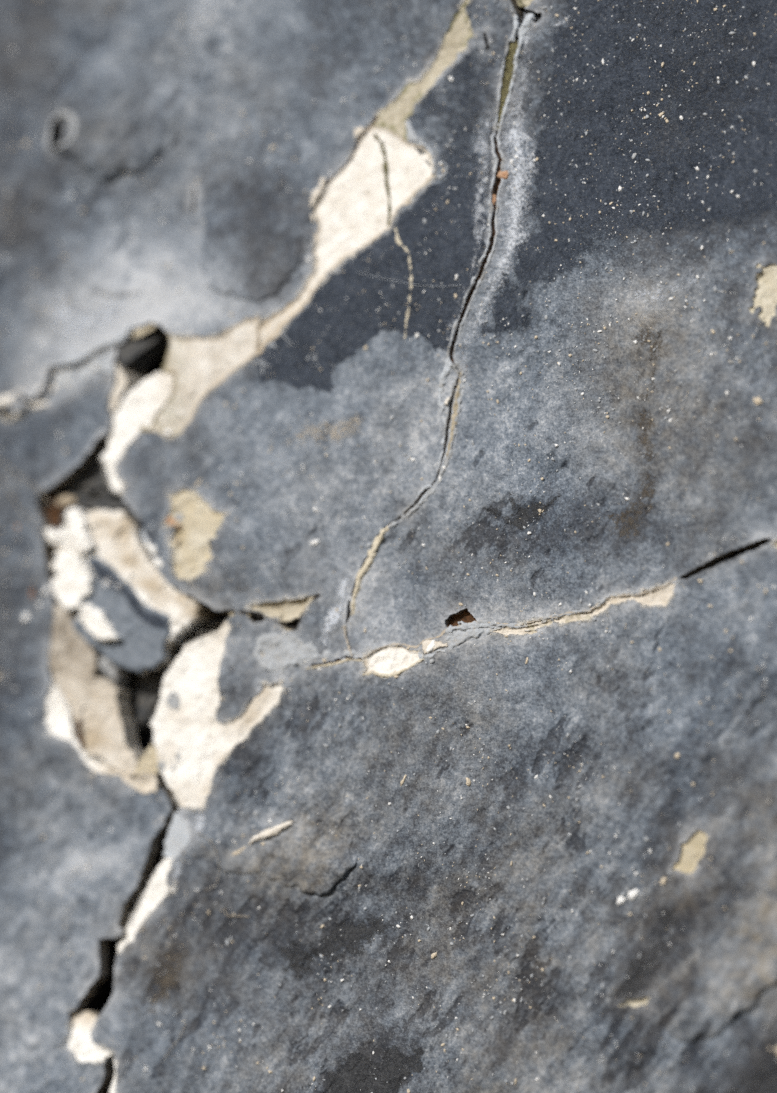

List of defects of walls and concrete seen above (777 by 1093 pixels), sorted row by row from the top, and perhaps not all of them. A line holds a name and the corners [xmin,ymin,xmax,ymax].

spalling [99,0,495,495]
crack [169,0,777,679]
peeling [477,0,777,344]
spalling [140,488,227,586]
spalling [149,612,286,811]
crack [109,779,191,954]
spalling [672,830,708,874]
crack [61,1002,117,1093]